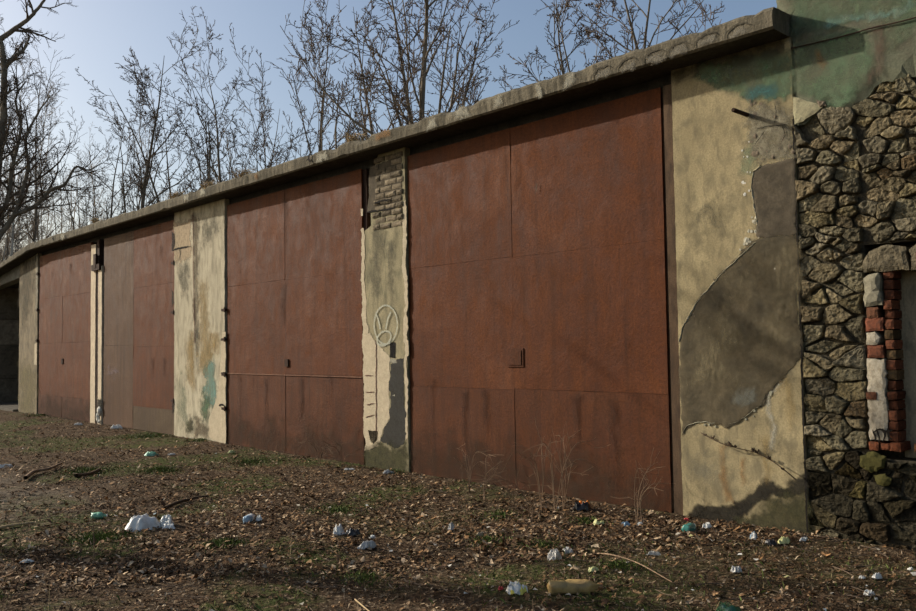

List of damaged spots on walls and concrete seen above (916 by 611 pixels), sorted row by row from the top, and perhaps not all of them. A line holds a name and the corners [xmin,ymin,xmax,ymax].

damp [179,214,216,343]
flaking render [360,151,409,450]
spalling [678,0,916,435]